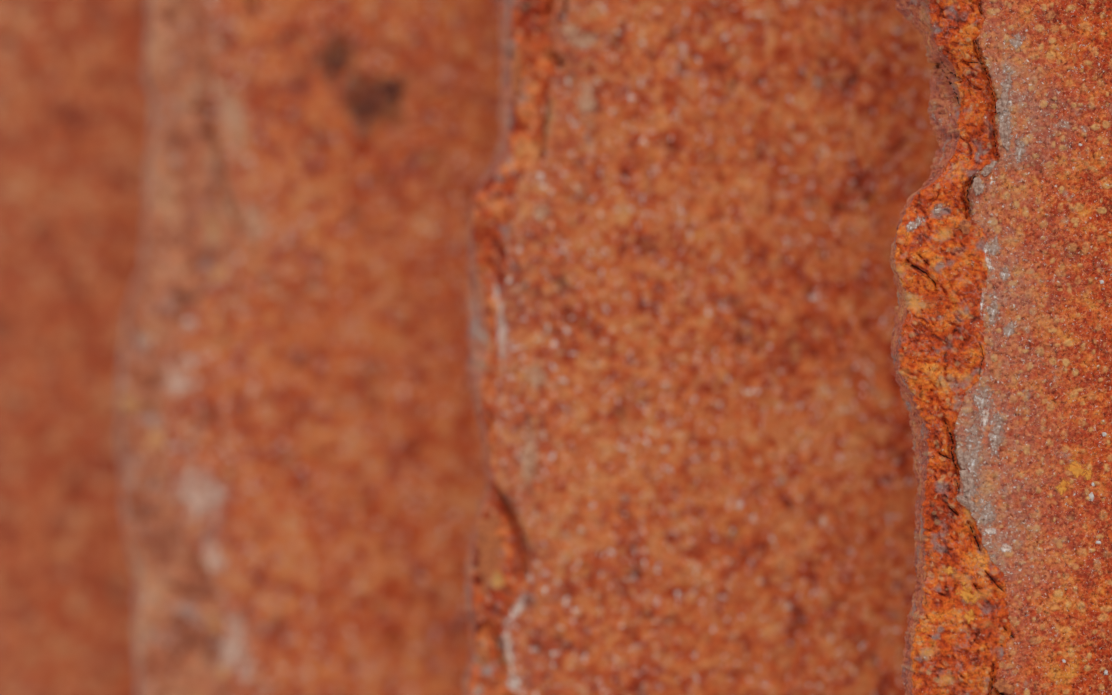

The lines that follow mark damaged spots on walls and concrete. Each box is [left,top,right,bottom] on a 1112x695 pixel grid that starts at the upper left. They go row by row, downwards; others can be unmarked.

spalling [889,0,1025,695]
rust [1055,459,1092,495]
rust [946,566,981,622]